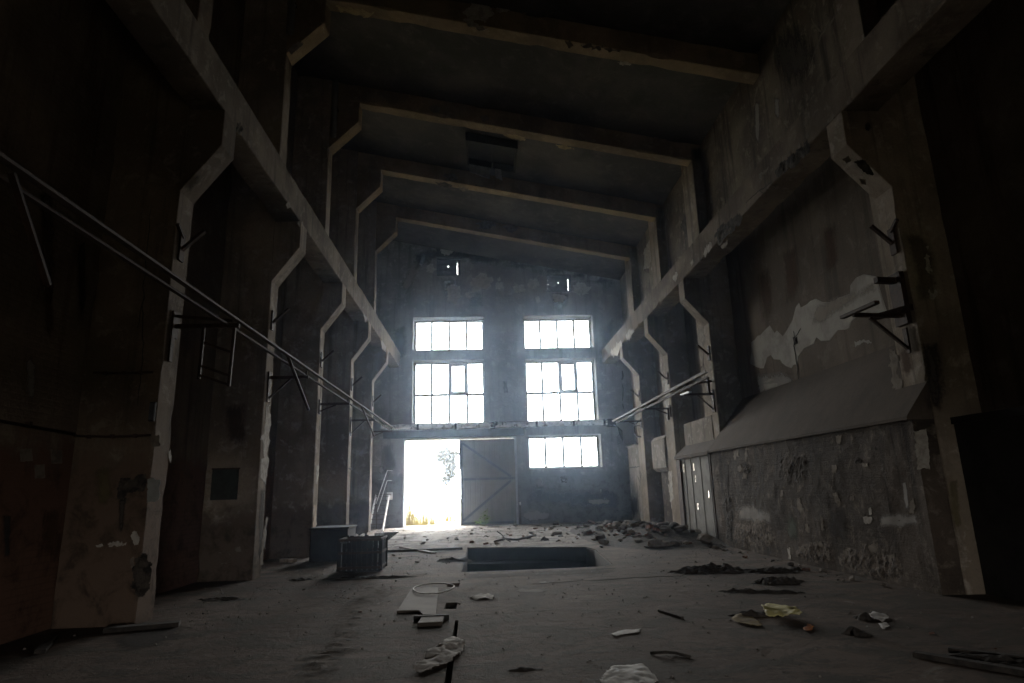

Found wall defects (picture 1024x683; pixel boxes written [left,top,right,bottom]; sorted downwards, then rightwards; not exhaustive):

peeling [750,274,887,389]
damp [739,506,770,524]
damp [881,482,916,526]
spalling [96,531,152,597]